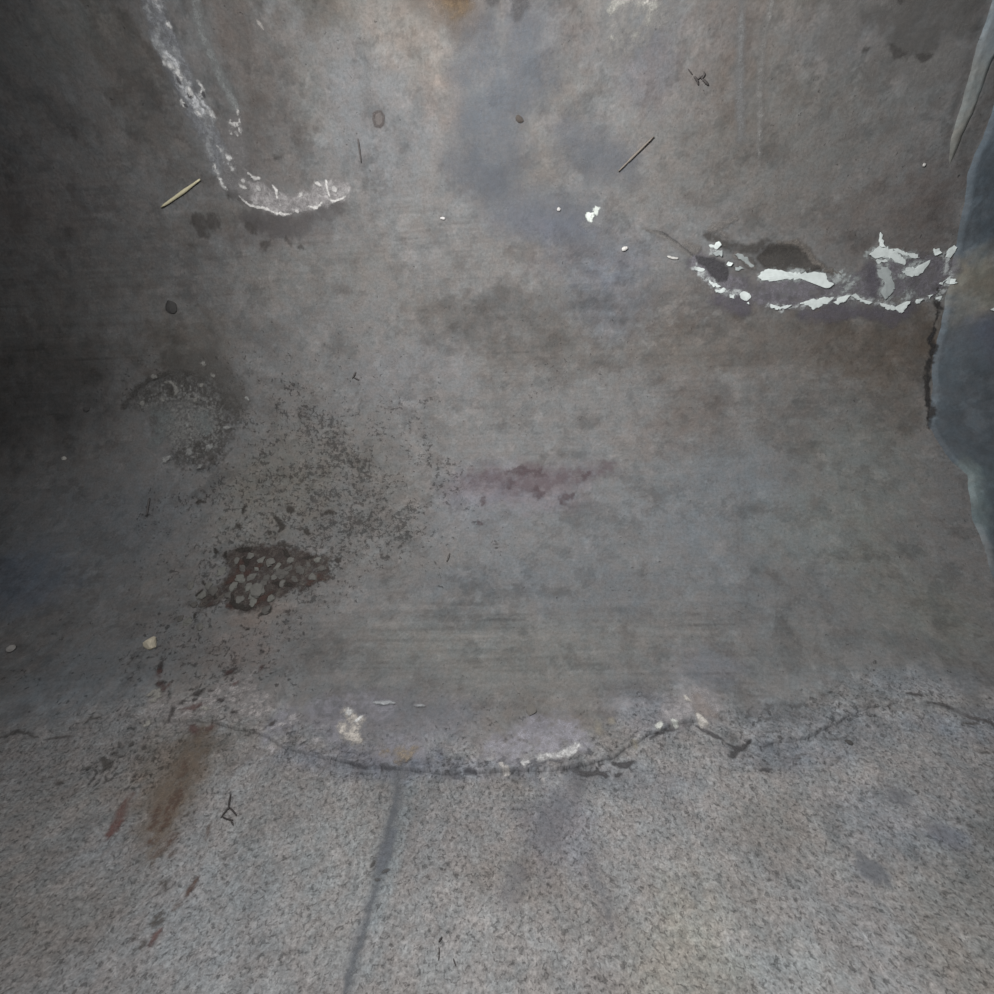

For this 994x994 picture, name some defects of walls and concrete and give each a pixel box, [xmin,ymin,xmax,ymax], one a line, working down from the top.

leakage [141,0,350,247]
peeling [667,215,959,323]
crack [923,288,943,428]